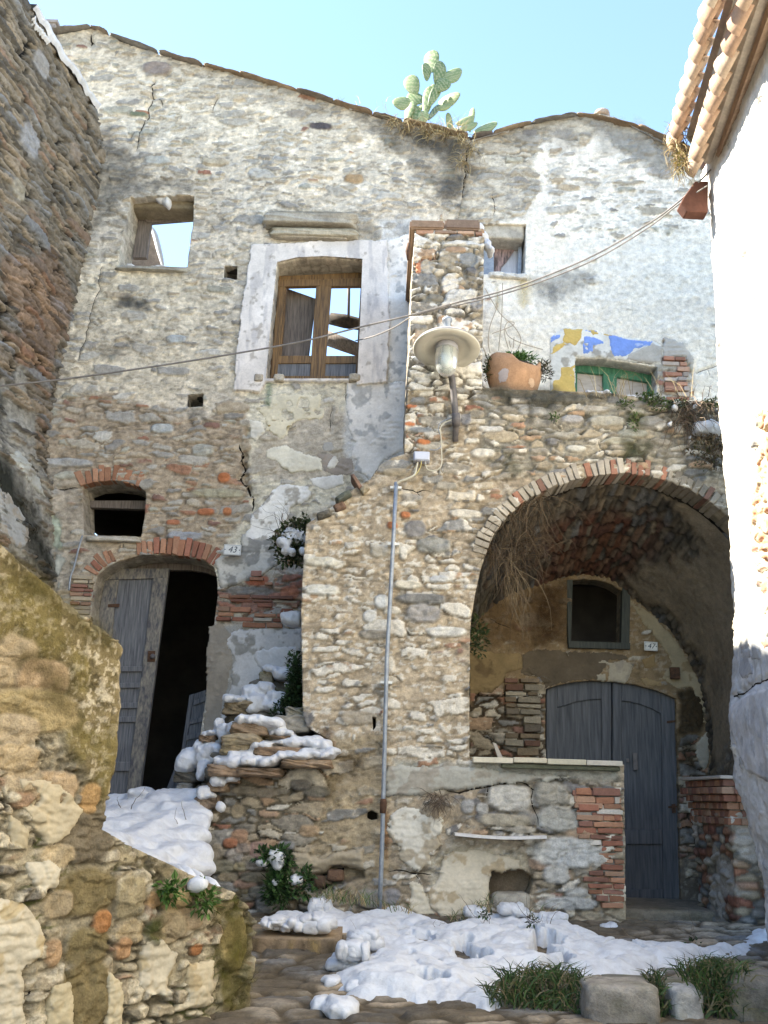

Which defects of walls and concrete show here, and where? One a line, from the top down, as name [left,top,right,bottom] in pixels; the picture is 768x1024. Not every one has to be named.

crack [131,83,163,151]
peeling [549,328,694,401]
crack [238,444,255,511]
flaking render [203,233,409,731]